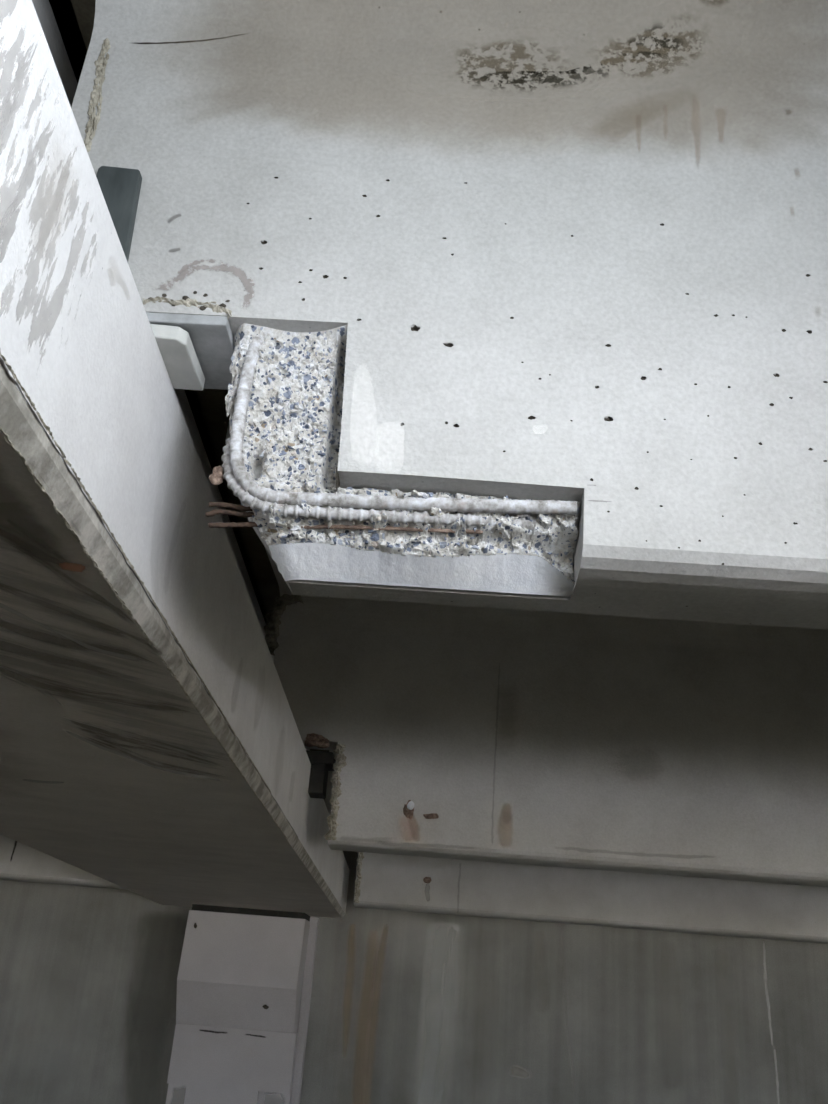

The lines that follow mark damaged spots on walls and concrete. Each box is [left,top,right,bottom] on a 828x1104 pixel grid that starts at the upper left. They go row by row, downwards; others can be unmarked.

crack [135,34,243,44]
mould [462,27,698,87]
spalling [143,291,581,597]